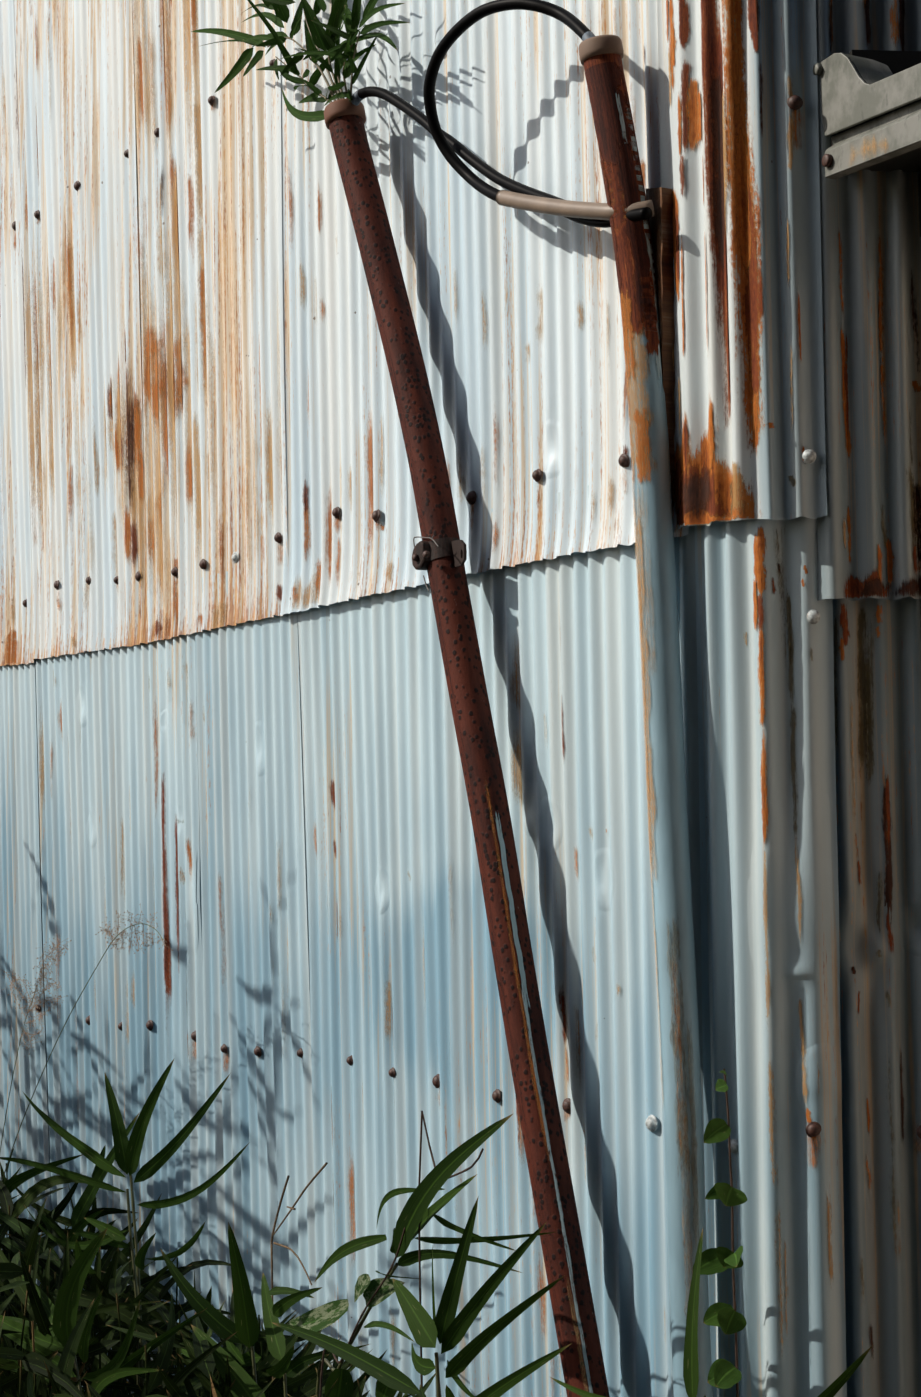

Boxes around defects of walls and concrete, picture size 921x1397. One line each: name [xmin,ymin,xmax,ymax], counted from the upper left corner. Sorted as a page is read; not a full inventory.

corrosion [14,0,215,635]
corrosion [786,222,802,421]
corrosion [247,425,283,561]
corrosion [276,481,340,606]
corrosion [350,420,384,550]
corrosion [839,428,921,660]
corrosion [5,605,17,663]
corrosion [153,720,192,1004]
corrosion [559,987,580,1074]